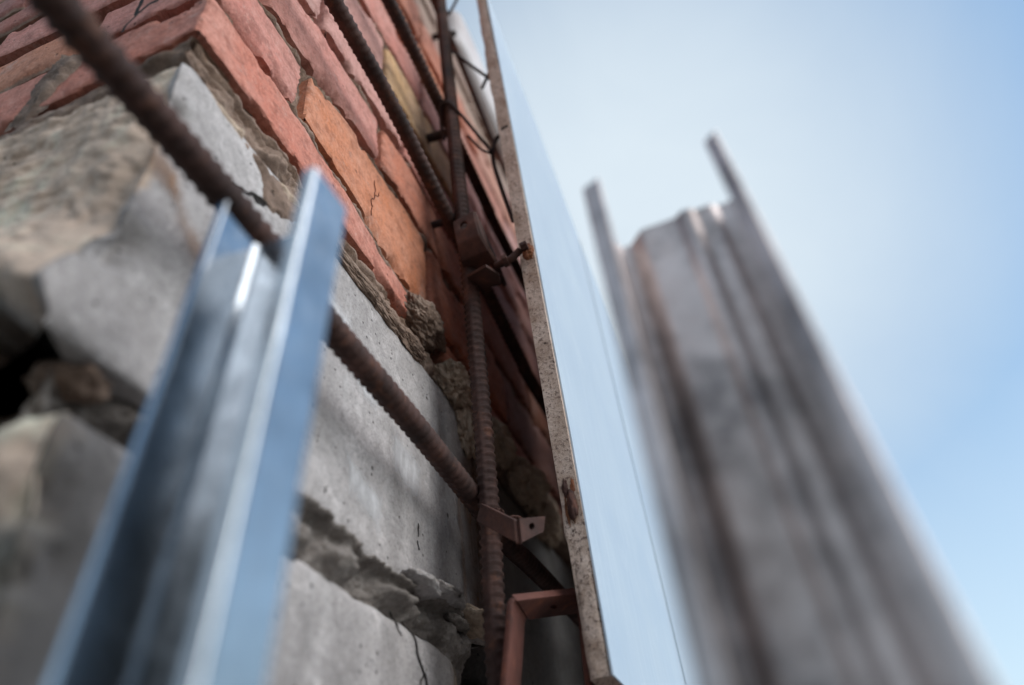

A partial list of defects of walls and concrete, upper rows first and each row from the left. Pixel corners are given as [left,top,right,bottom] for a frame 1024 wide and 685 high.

spalling [4,0,297,250]
spalling [0,359,145,453]
spalling [287,0,565,685]